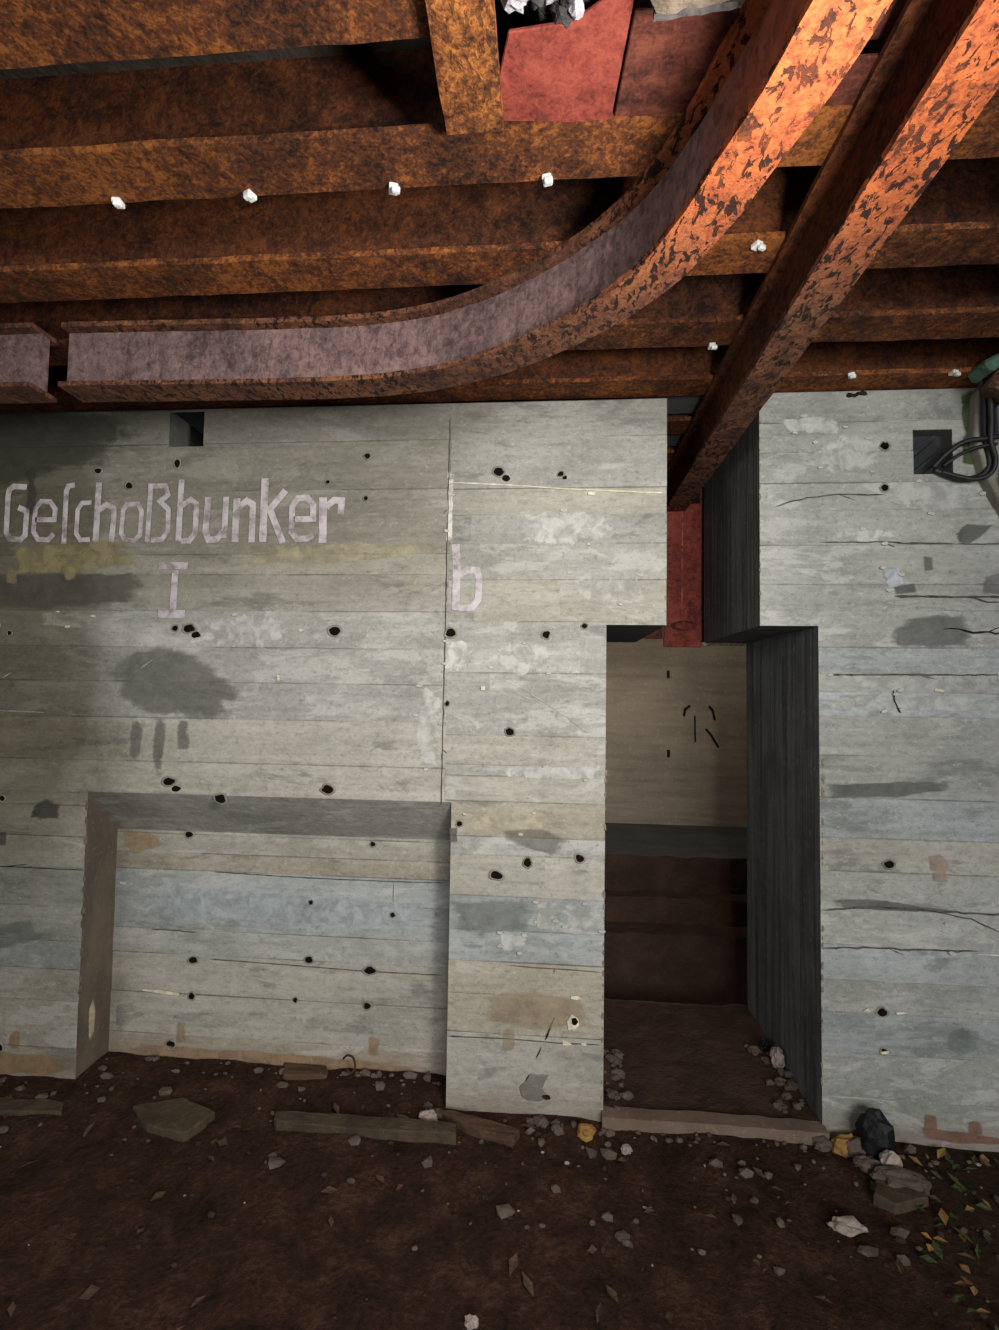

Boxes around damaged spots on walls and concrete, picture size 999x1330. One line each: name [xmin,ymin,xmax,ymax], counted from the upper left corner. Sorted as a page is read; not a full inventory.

crack [895,595,999,635]
crack [822,906,999,955]